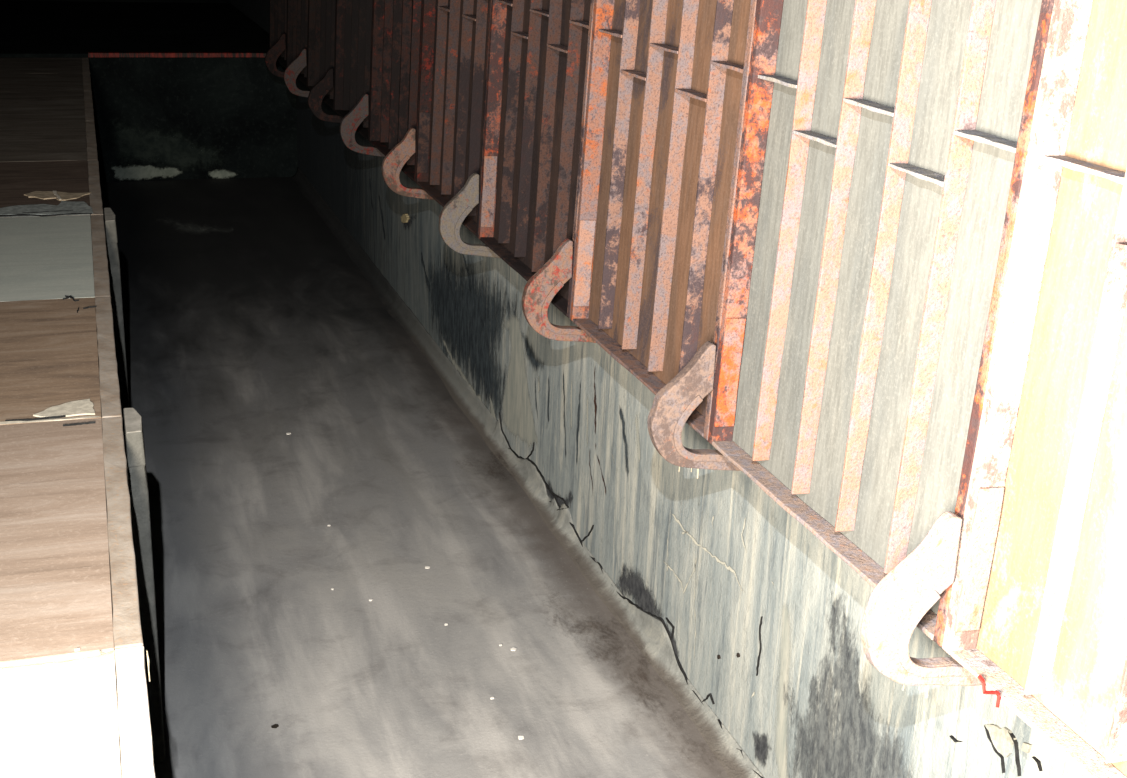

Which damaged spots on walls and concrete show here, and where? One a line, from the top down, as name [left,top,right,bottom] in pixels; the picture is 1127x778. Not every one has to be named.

crack [499,412,763,778]
water stain [775,597,909,778]